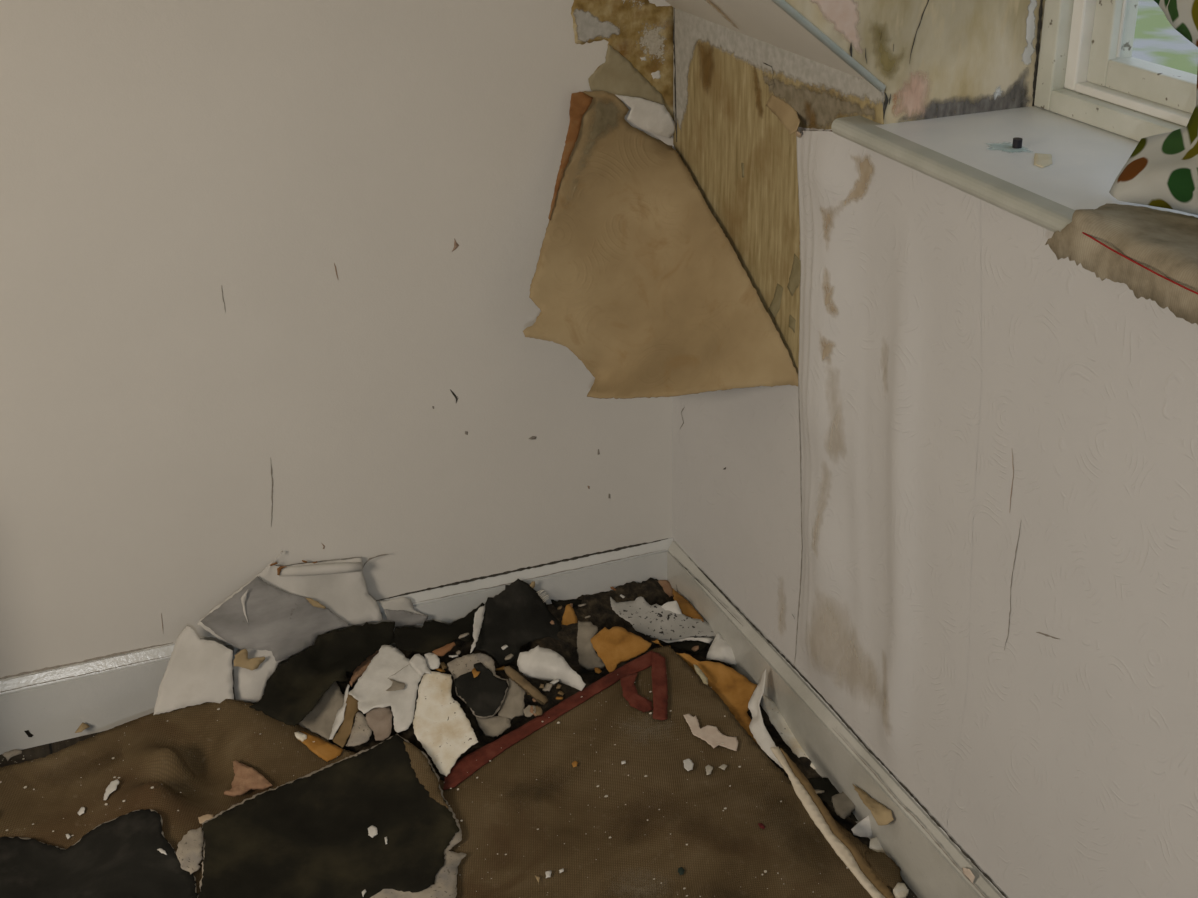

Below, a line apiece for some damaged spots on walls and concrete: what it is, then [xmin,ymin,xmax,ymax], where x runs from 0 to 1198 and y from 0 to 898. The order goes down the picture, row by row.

peeling [1022,0,1037,65]
peeling [571,0,928,373]
leakage [845,159,873,203]